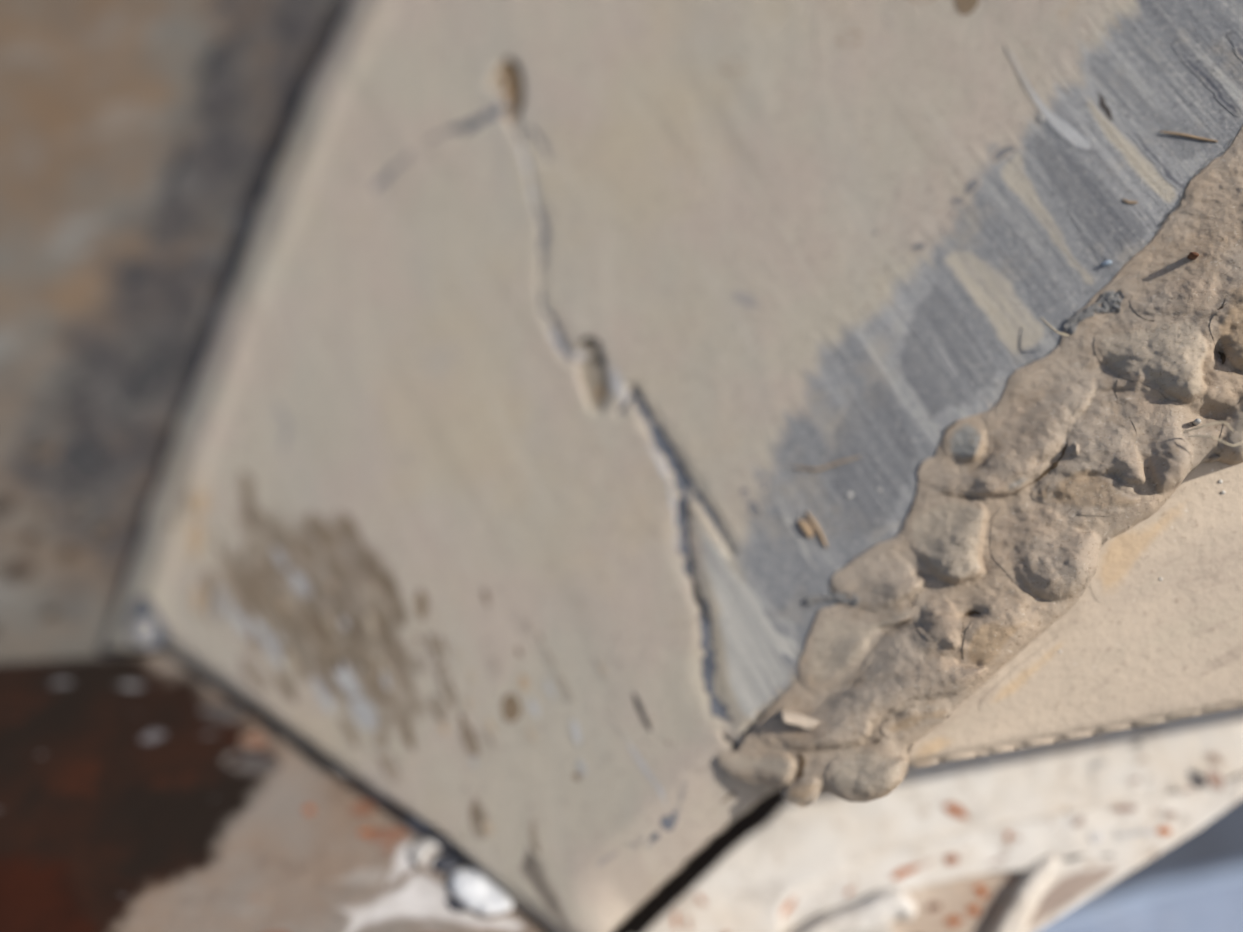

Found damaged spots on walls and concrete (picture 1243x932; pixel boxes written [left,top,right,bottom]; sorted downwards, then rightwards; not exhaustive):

spalling [1006,45,1093,151]
crack [608,362,765,750]